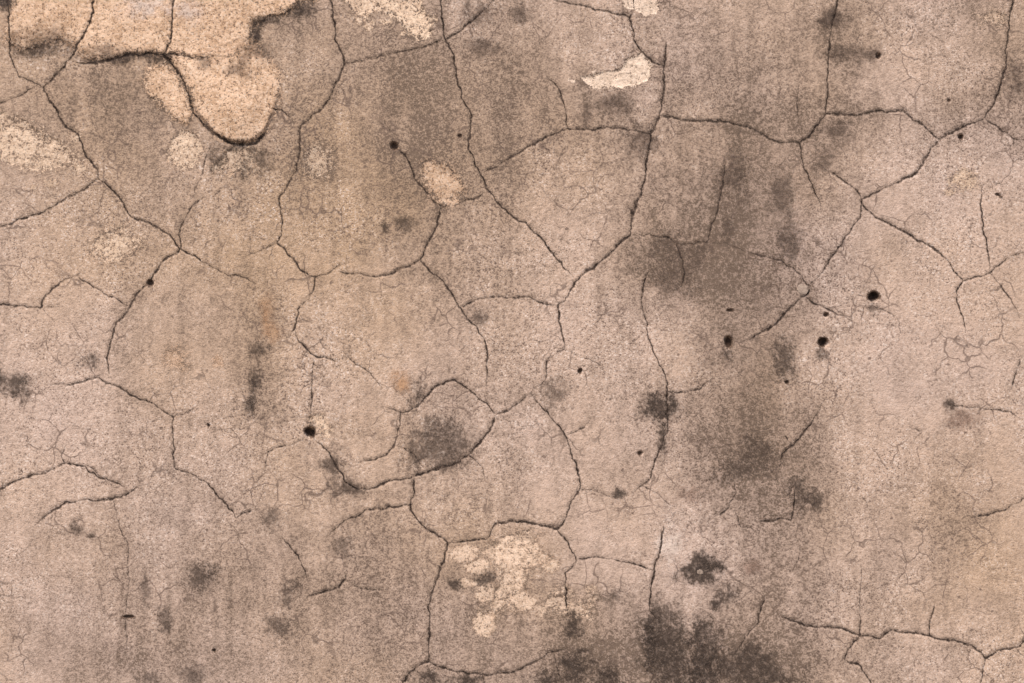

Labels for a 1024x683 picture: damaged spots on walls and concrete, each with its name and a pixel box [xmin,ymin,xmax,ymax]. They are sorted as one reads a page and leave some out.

peeling [4,0,316,179]
peeling [568,50,652,89]
peeling [420,159,465,206]
crack [0,0,265,518]
crack [250,0,1024,683]
leakage [643,391,678,450]
crack [0,451,135,637]
peeling [448,530,597,638]
leakage [656,519,736,609]
leakage [644,605,787,683]